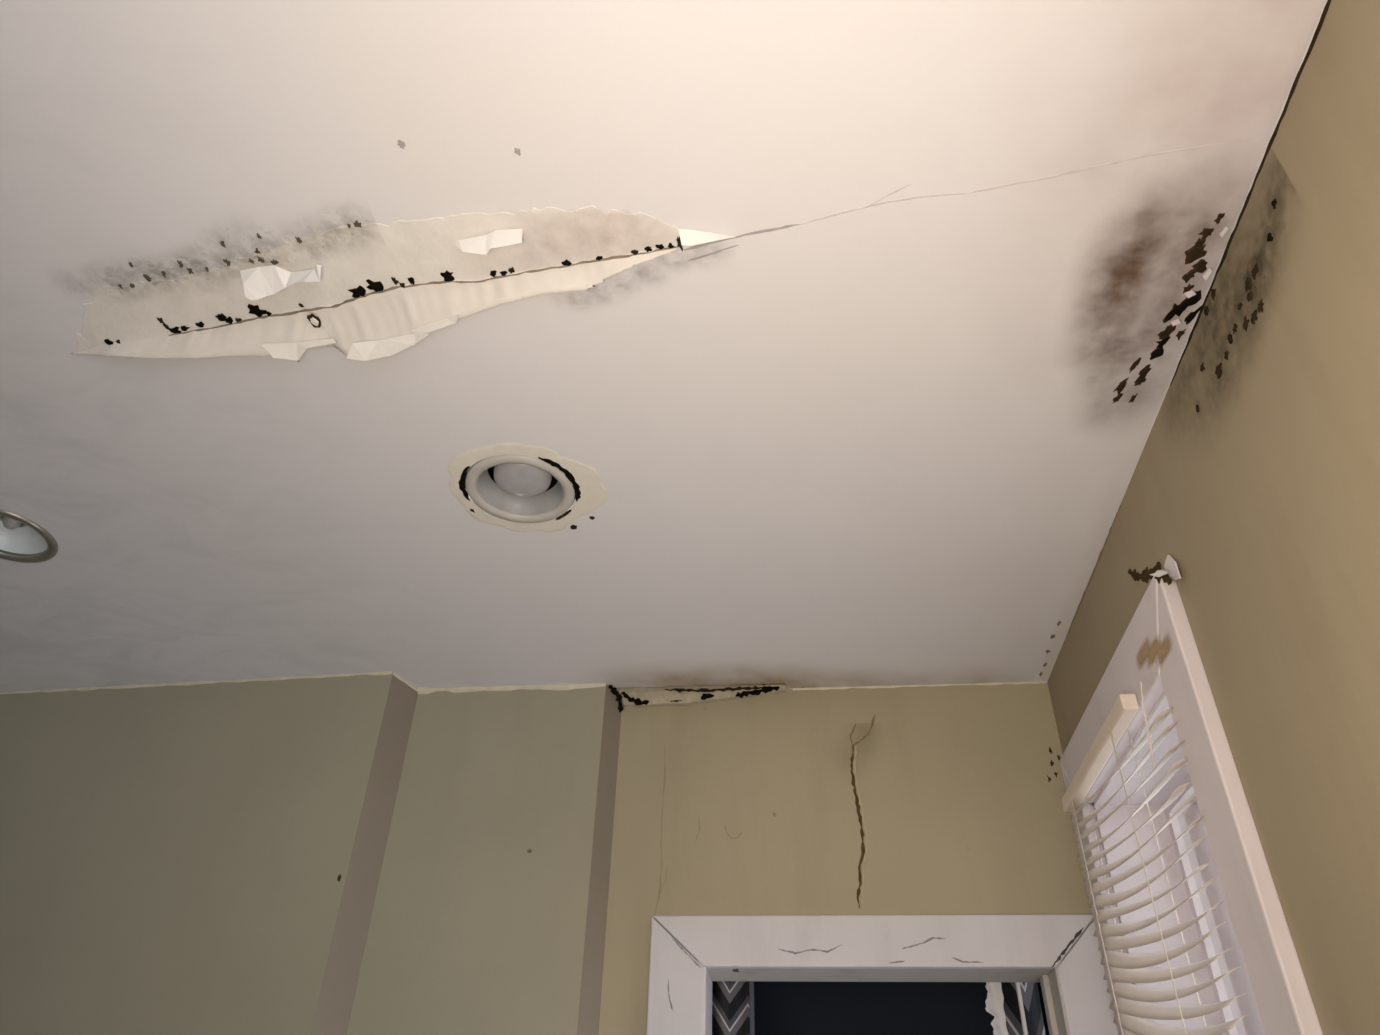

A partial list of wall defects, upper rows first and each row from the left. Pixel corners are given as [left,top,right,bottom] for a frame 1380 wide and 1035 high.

leakage [118,241,231,289]
leakage [248,233,279,265]
peeling [71,205,734,362]
crack [684,0,1331,386]
leakage [1103,235,1161,305]
leakage [1112,213,1273,403]
crack [1068,503,1122,633]
crack [850,715,875,908]